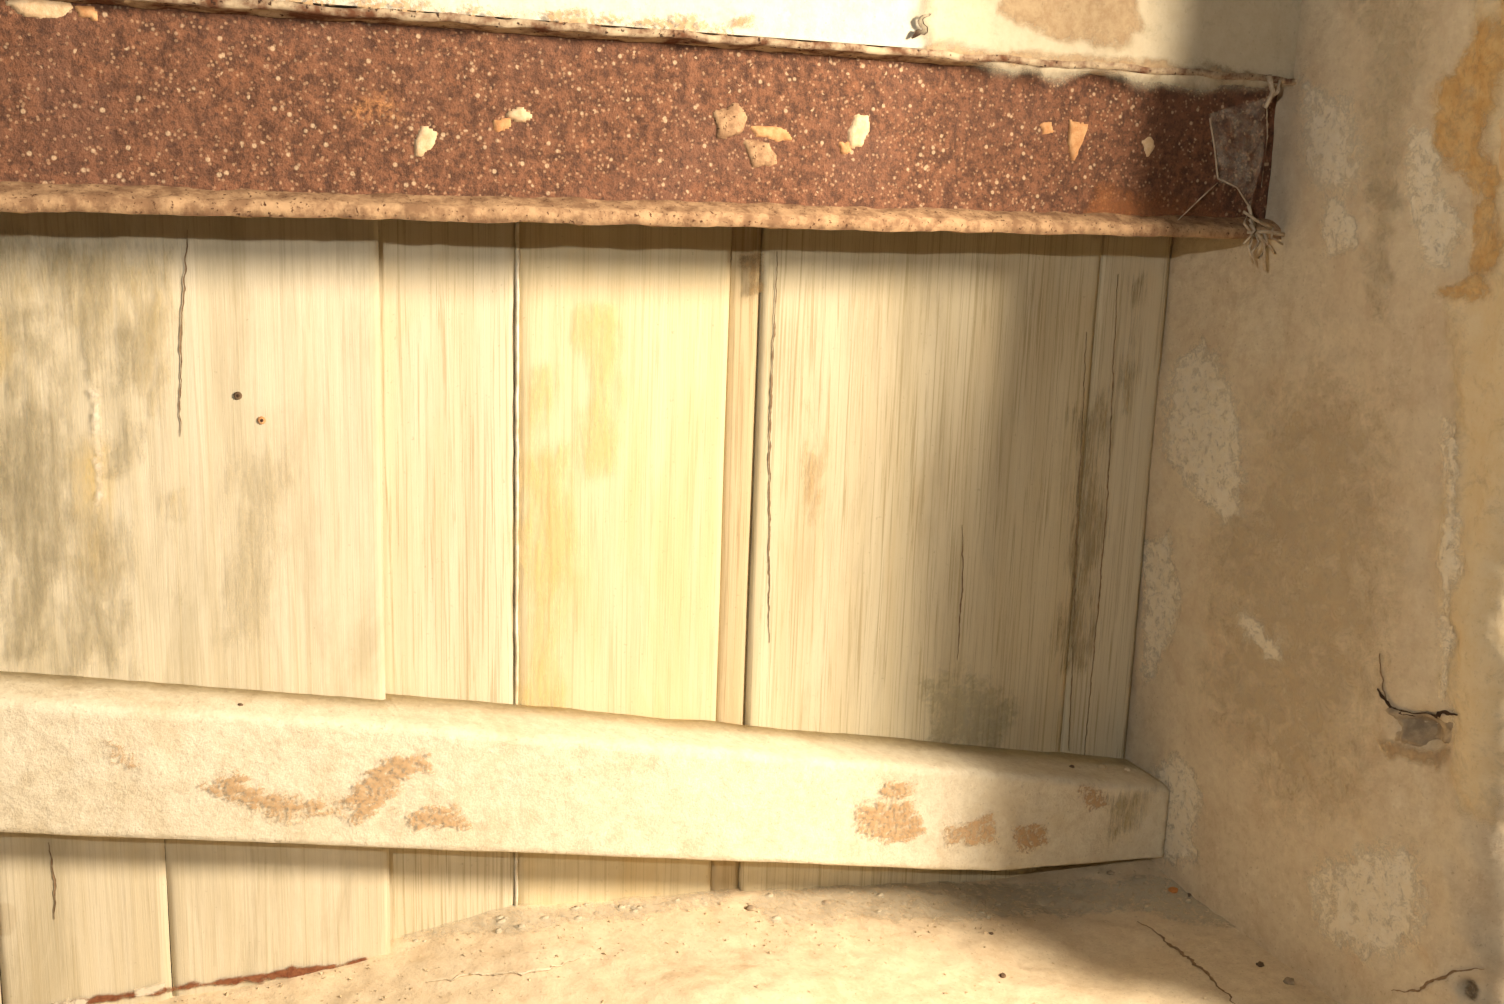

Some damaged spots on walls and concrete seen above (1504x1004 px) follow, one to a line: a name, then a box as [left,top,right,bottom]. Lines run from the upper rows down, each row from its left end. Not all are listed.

corrosion [927,43,1177,68]
water stain [1406,1,1504,300]
corrosion [1089,188,1211,217]
crack [1137,921,1235,1004]
crack [1391,968,1484,1000]